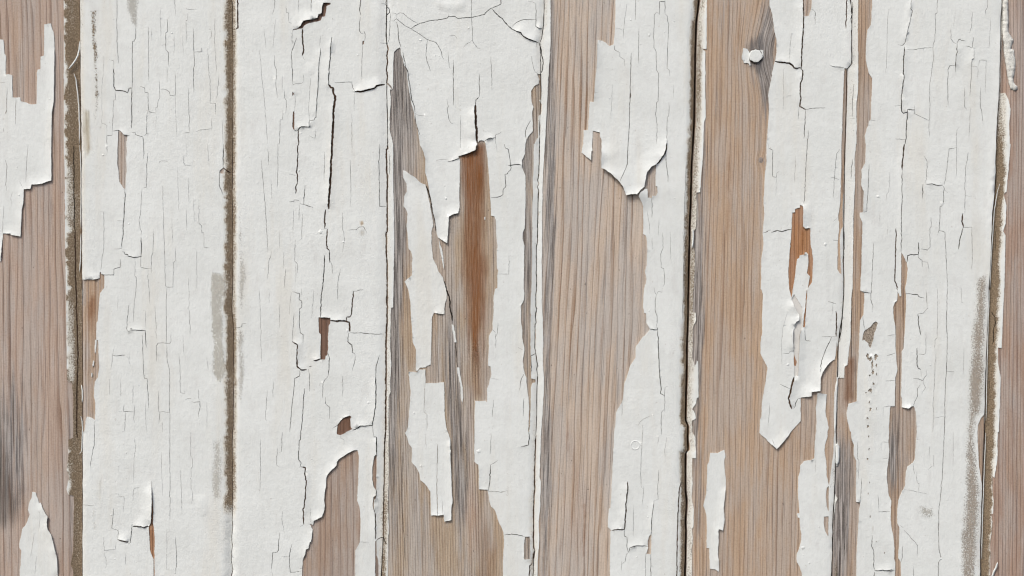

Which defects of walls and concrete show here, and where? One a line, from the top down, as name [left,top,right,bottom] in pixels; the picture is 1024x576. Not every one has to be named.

peeling [0,0,105,576]
crack [90,462,193,551]
crack [73,0,239,460]
peeling [318,317,330,360]
peeling [302,450,361,576]
crack [236,0,544,576]
peeling [372,48,504,576]
peeling [521,0,658,576]
peeling [691,0,878,576]
crack [769,0,991,575]
peeling [884,253,917,576]
peeling [977,0,1024,576]